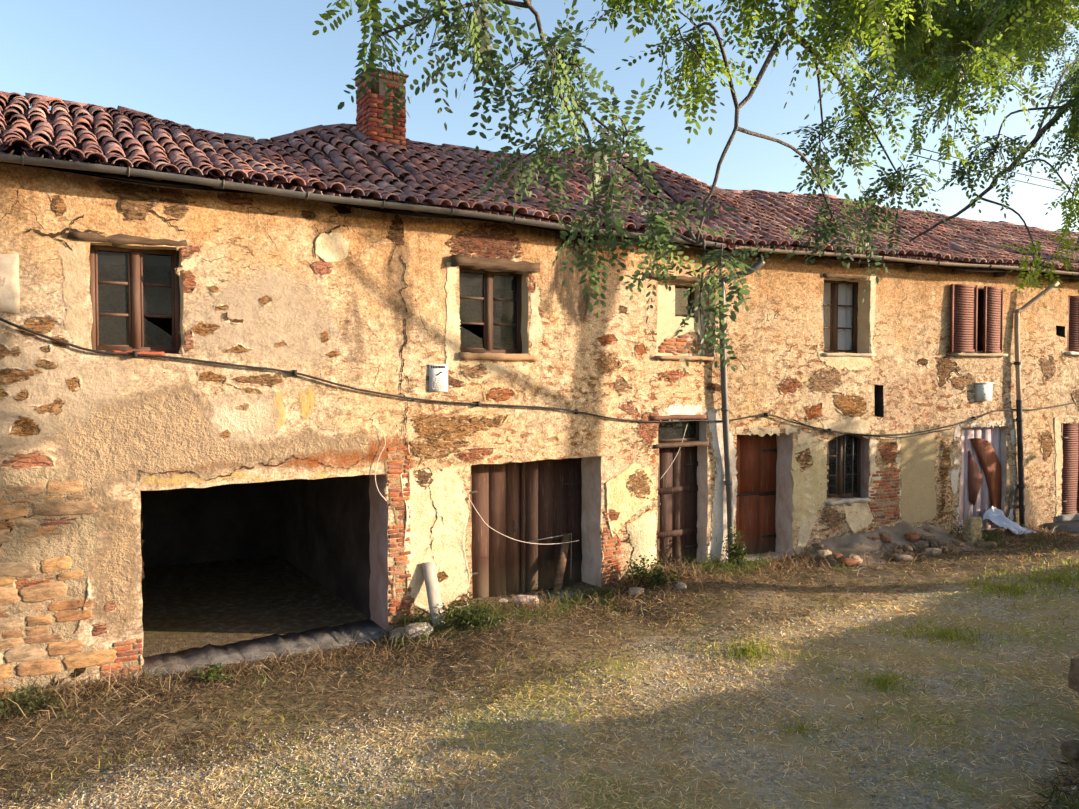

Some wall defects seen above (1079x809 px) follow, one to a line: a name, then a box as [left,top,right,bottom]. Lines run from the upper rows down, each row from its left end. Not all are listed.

crack [25,215,107,251]
flaking render [90,179,197,225]
crack [105,189,189,234]
damp [502,225,596,325]
flaking render [0,314,82,437]
crack [387,216,445,572]
flaking render [594,333,661,451]
flaking render [778,367,869,422]
flaking render [0,451,144,700]
crack [129,454,376,482]
flaking render [600,468,653,587]
flaking render [819,439,902,529]